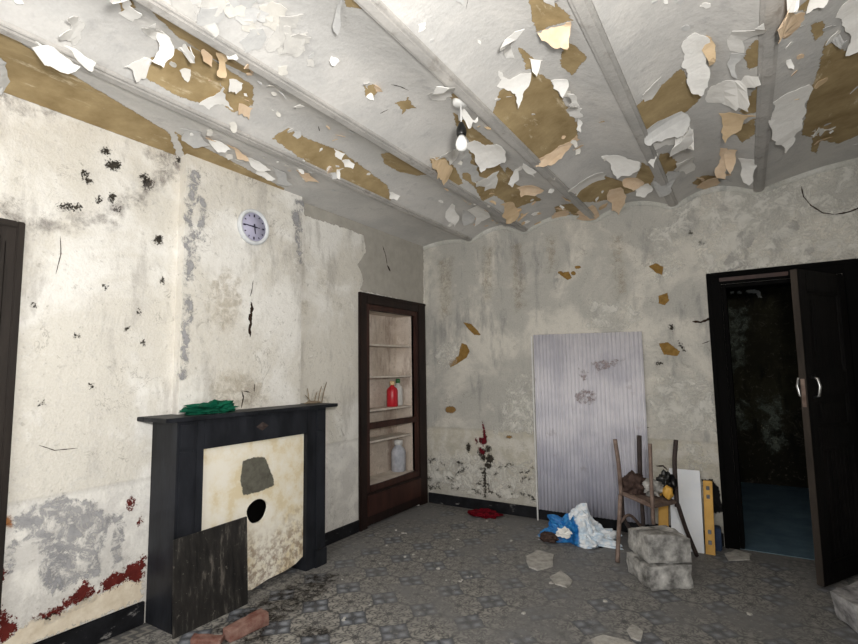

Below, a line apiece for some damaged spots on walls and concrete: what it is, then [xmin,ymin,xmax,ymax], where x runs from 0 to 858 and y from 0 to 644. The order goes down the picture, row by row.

peeling [0,0,858,281]
damp [100,147,122,172]
damp [138,173,166,201]
damp [95,192,122,212]
peeling [178,297,193,380]
flaking render [449,343,470,367]
flaking render [659,342,680,356]
damp [466,439,536,502]
peeling [0,495,147,644]